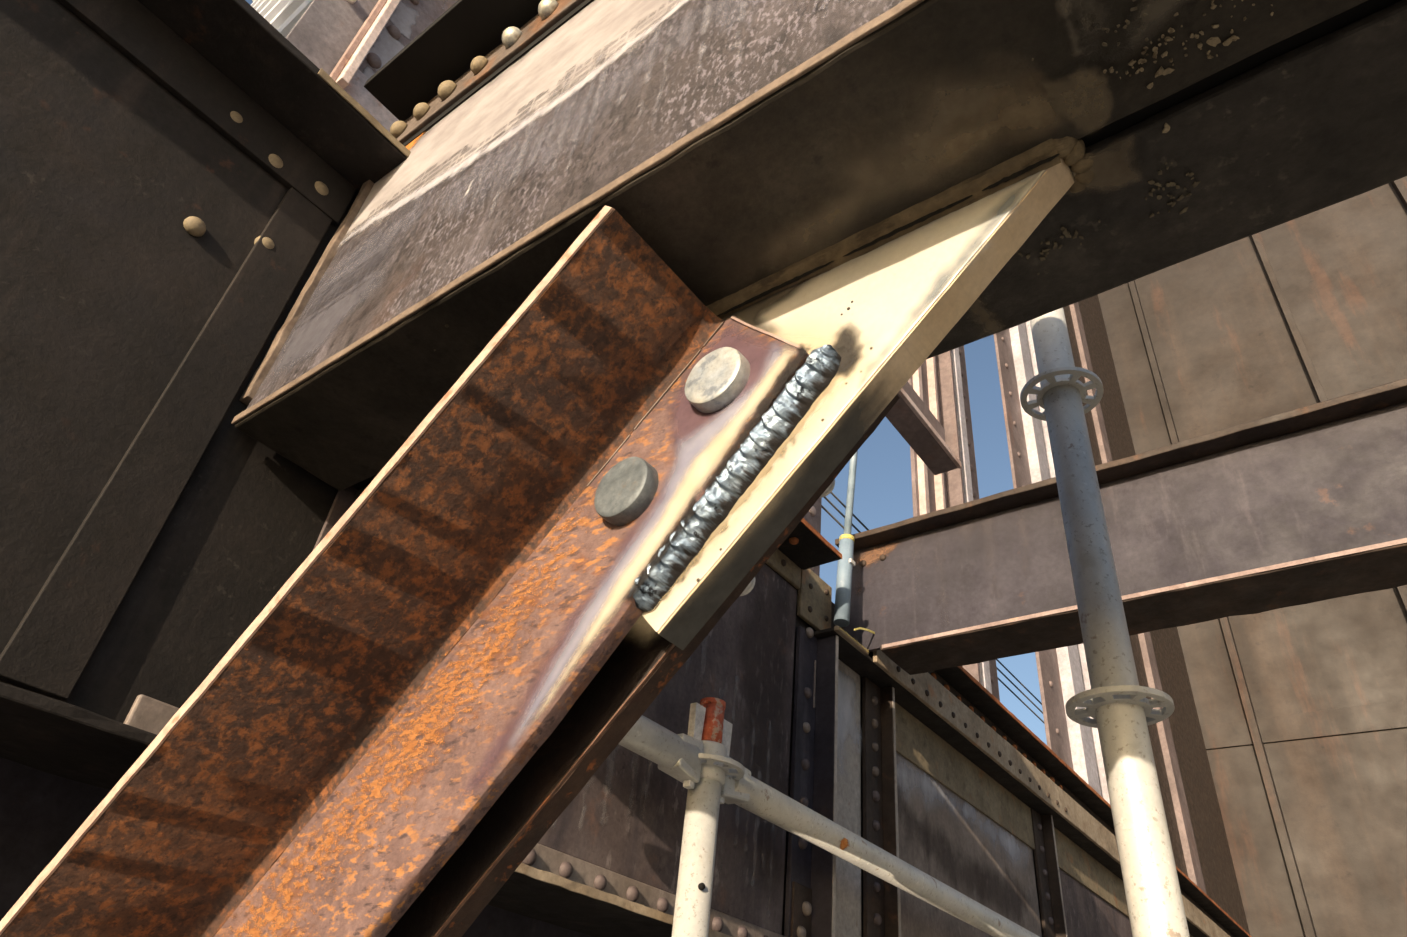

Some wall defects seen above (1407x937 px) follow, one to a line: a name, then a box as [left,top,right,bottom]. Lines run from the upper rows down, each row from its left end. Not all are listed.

peeling [1103,0,1274,89]
corrosion [231,513,585,937]